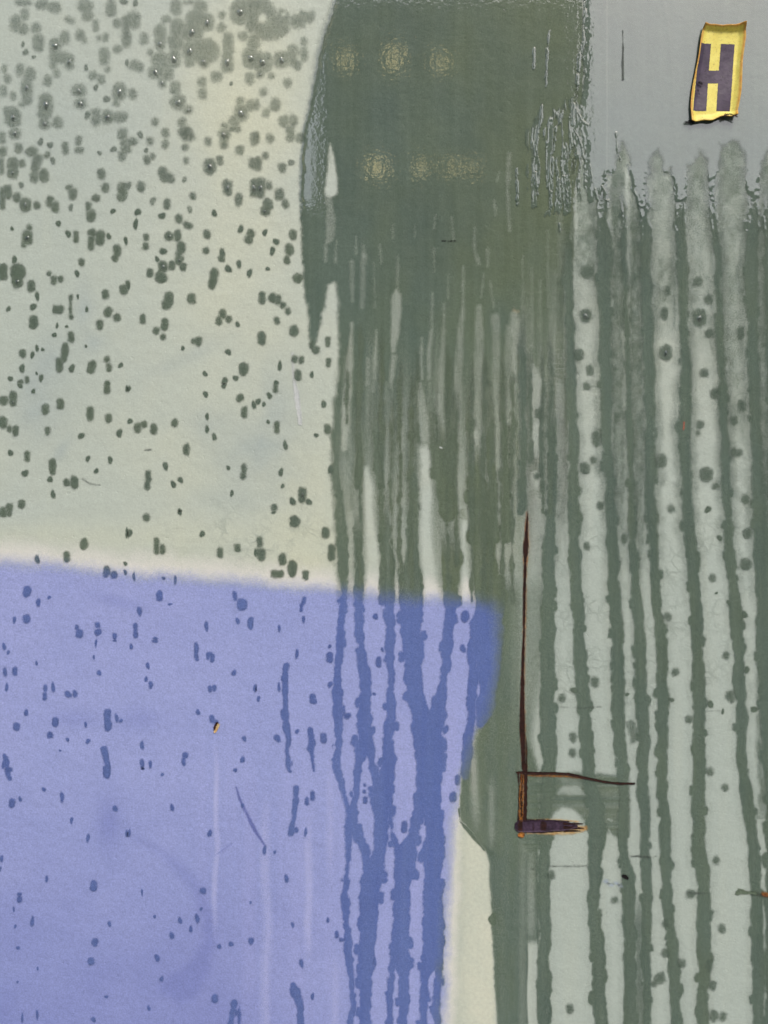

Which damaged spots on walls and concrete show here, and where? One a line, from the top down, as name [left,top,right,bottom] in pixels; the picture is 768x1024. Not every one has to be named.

leakage [87,0,317,165]
leakage [0,63,64,213]
leakage [66,167,145,267]
leakage [221,132,291,217]
leakage [0,263,37,293]
leakage [52,294,75,374]
leakage [94,279,131,330]
leakage [139,198,226,340]
leakage [257,291,291,325]
leakage [0,375,31,437]
leakage [277,0,768,1024]
leakage [255,536,310,580]